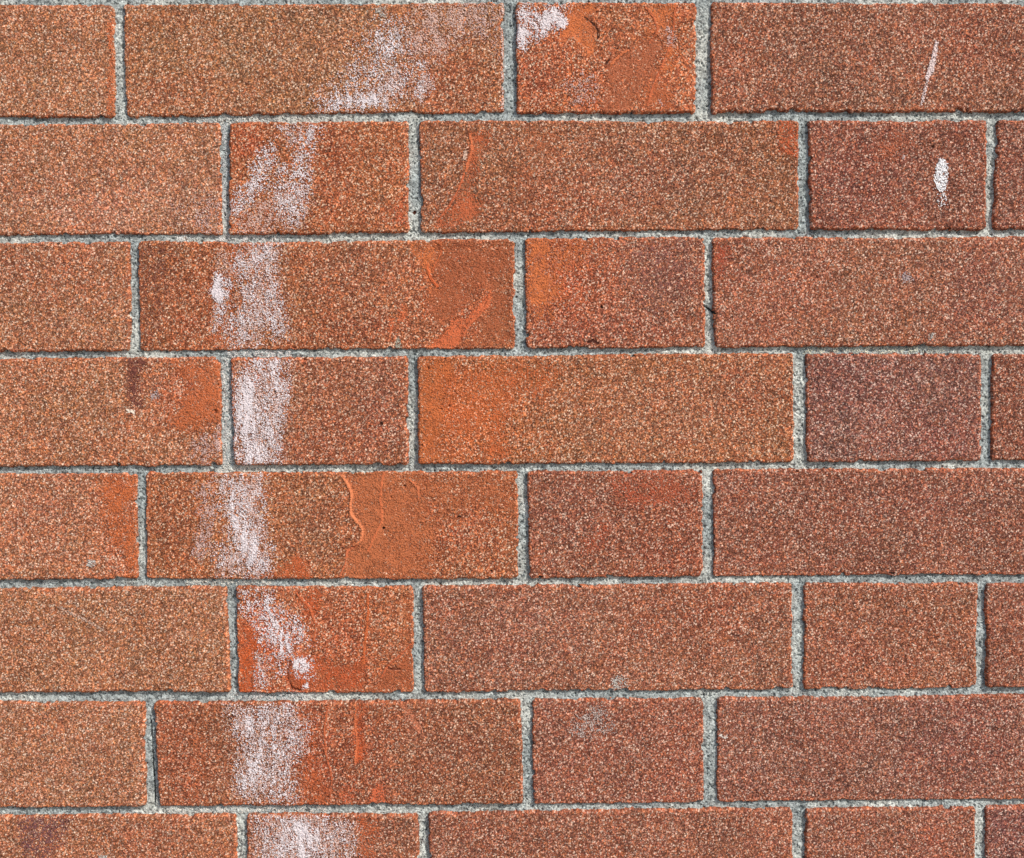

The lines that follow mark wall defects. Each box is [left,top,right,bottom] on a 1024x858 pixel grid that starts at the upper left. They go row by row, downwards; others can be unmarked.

leakage [122,13,435,858]
efflorescence [459,2,573,111]